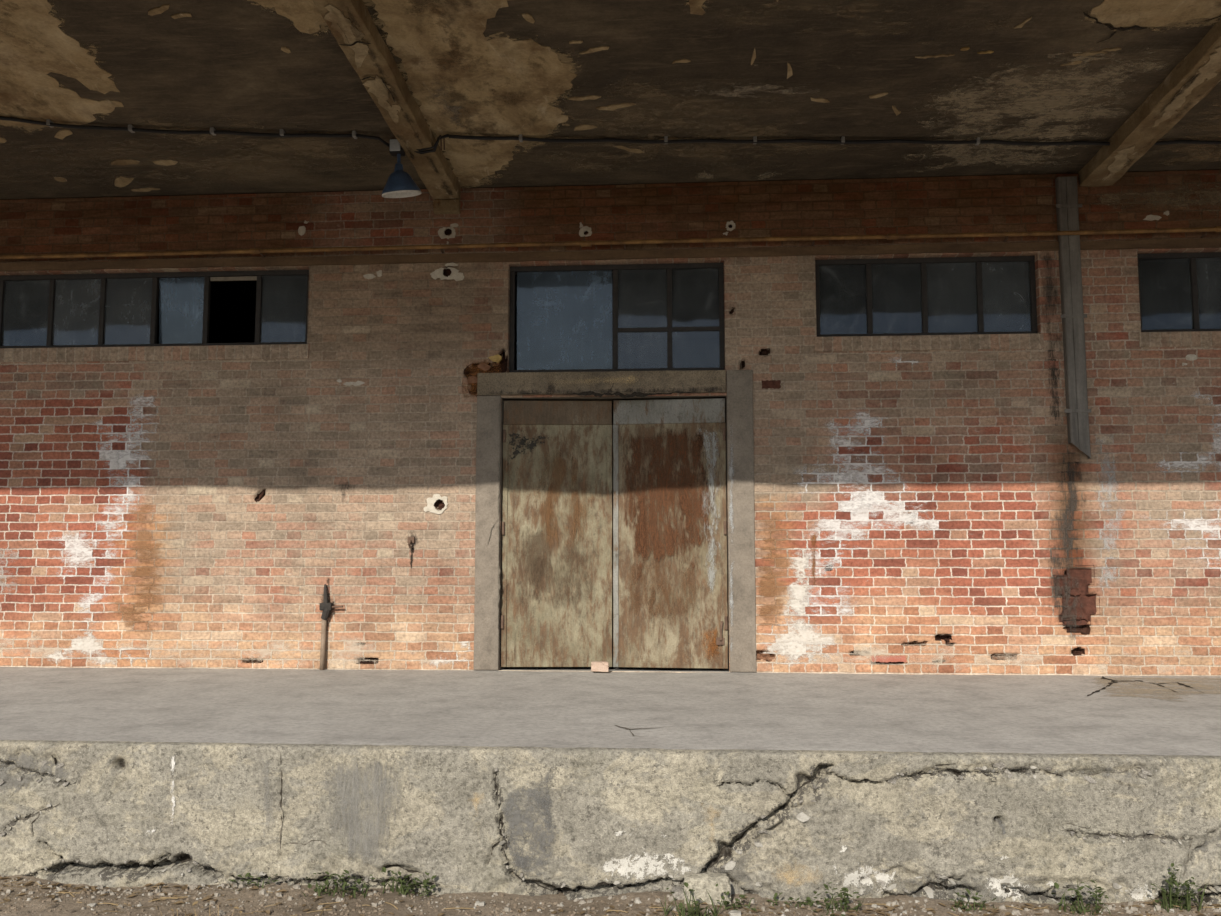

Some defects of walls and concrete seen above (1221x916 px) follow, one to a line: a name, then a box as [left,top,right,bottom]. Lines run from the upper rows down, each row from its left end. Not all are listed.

peeling [0,0,124,143]
peeling [247,0,636,188]
peeling [1084,0,1221,31]
water stain [0,397,316,664]
corrosion [522,457,591,604]
corrosion [623,429,714,615]
water stain [763,412,943,666]
water stain [1168,509,1221,569]
crack [0,754,434,892]
crack [487,762,1140,900]
crack [1003,884,1081,905]
crack [1048,823,1221,904]